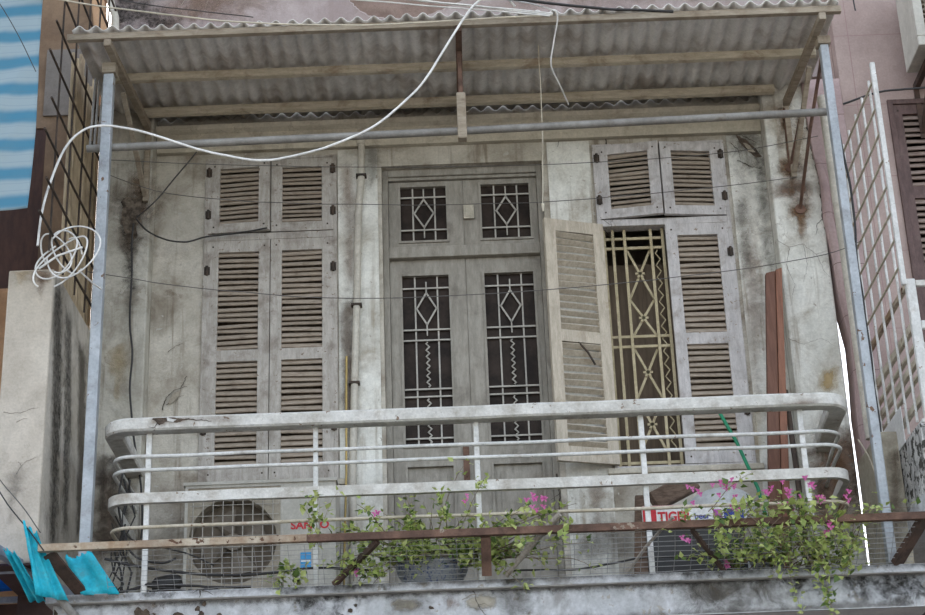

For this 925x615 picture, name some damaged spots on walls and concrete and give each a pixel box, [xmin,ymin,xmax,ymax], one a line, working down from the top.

peeling [349,0,464,19]
corrosion [790,203,809,232]
crack [777,117,830,304]
leakage [50,286,85,541]
peeling [151,376,208,428]
leakage [92,459,126,555]